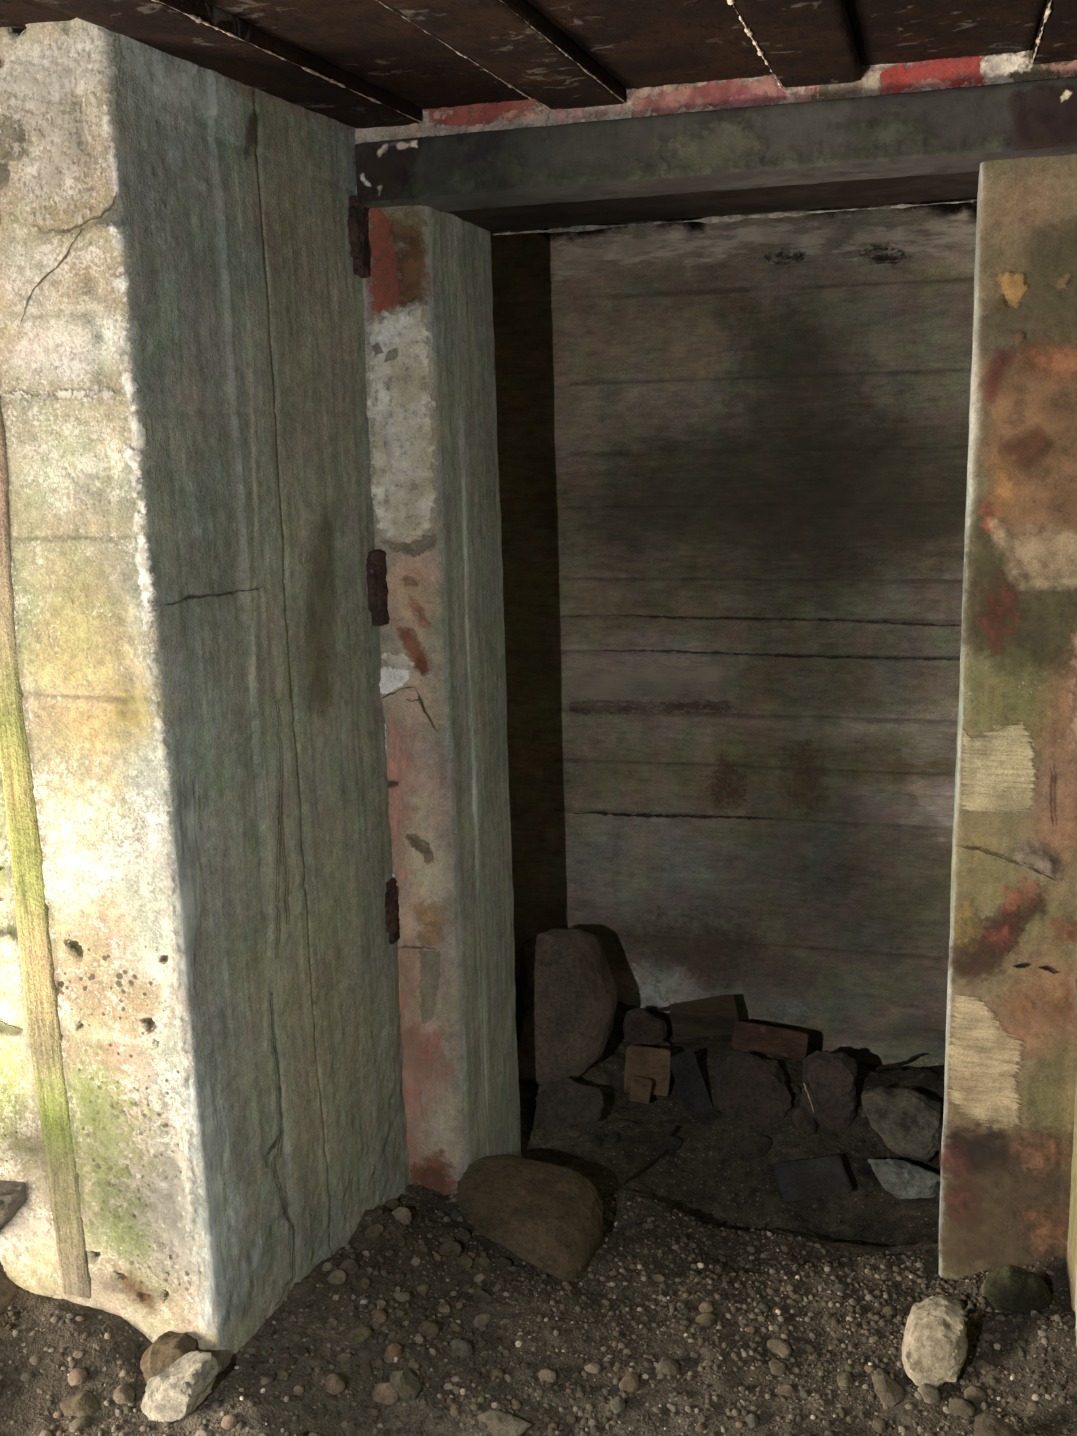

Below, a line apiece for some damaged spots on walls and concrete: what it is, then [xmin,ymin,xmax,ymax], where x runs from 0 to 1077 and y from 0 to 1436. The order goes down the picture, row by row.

crack [20,193,117,324]
rust [398,602,430,674]